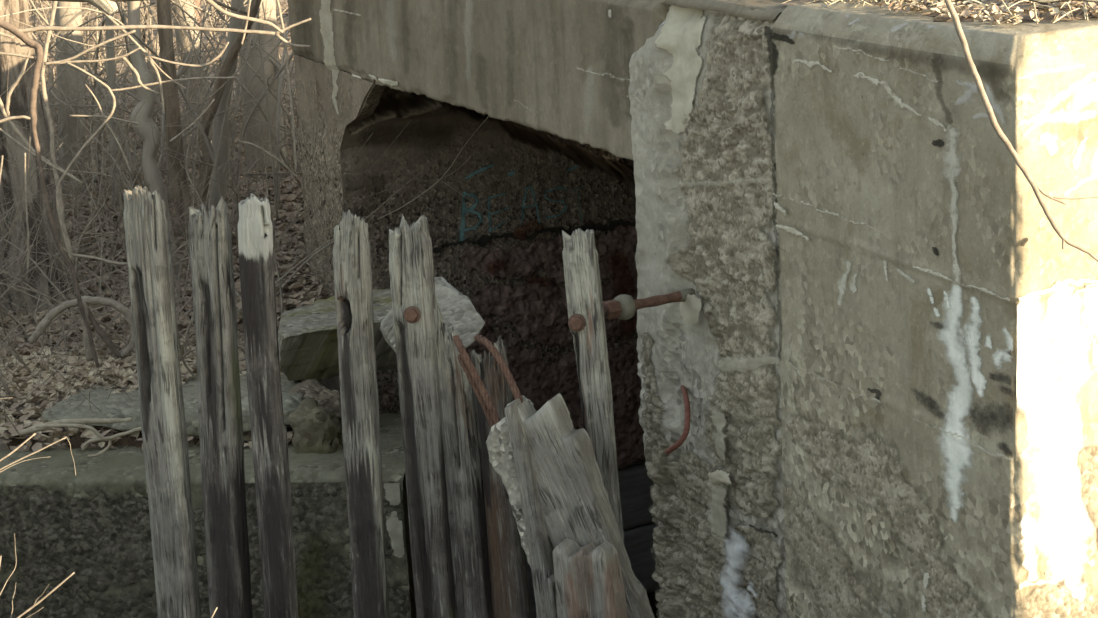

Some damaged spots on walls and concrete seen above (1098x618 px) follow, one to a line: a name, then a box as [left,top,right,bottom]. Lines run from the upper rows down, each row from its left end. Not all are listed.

spalling [459,235,583,430]
corrosion [610,252,633,296]
corrosion [621,312,637,335]
spalling [594,5,990,618]
damp [838,261,857,306]
damp [927,128,1098,602]
damp [710,410,727,461]
spalling [971,373,1013,457]
spalling [1077,445,1098,527]
damp [705,484,757,618]
spalling [1022,585,1098,618]